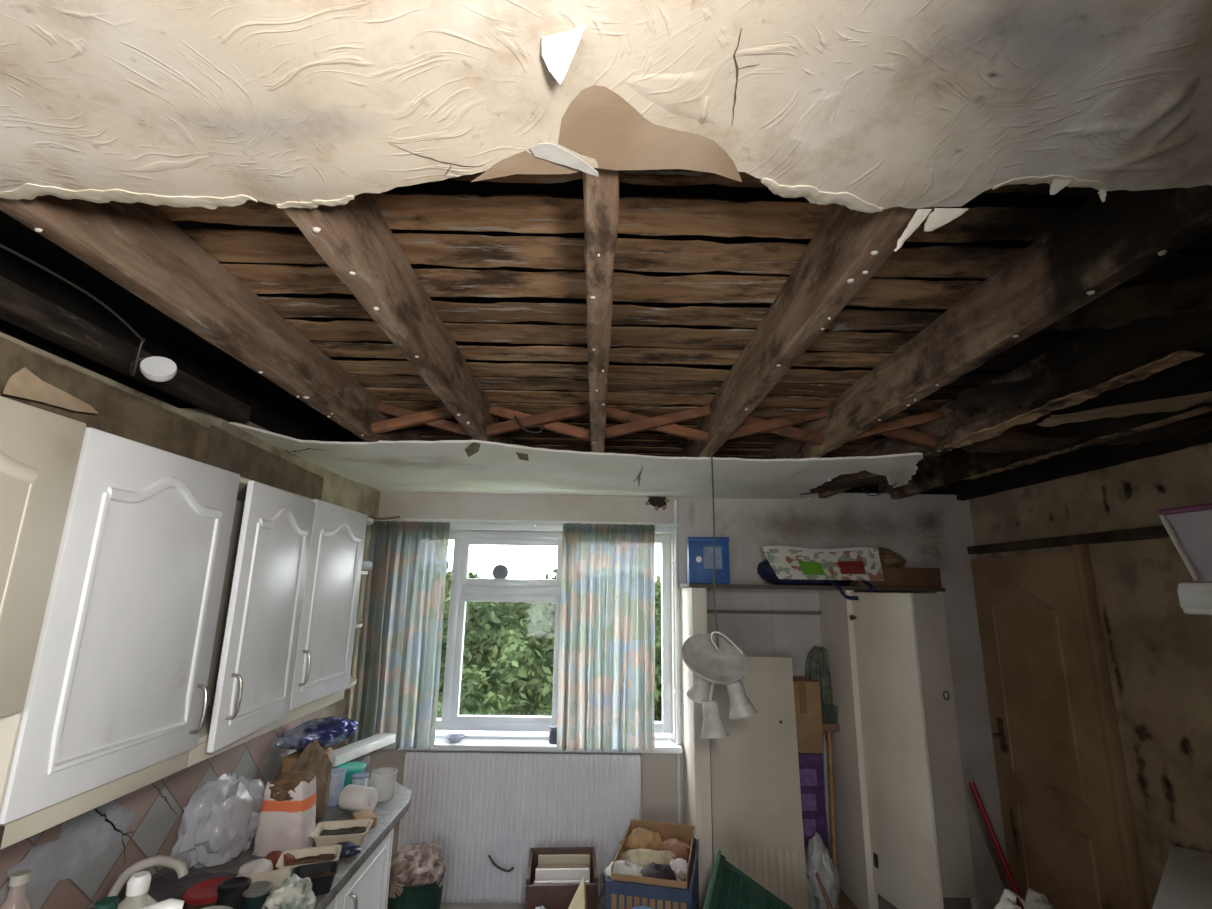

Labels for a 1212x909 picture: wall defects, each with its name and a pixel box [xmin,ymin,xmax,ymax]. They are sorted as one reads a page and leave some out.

peeling [541,25,586,84]
crack [731,28,759,126]
flaking render [471,85,742,182]
flaking render [0,183,258,210]
flaking render [276,195,355,209]
flaking render [761,178,883,213]
flaking render [992,174,1106,190]
flaking render [0,337,209,463]
flaking render [465,443,480,457]